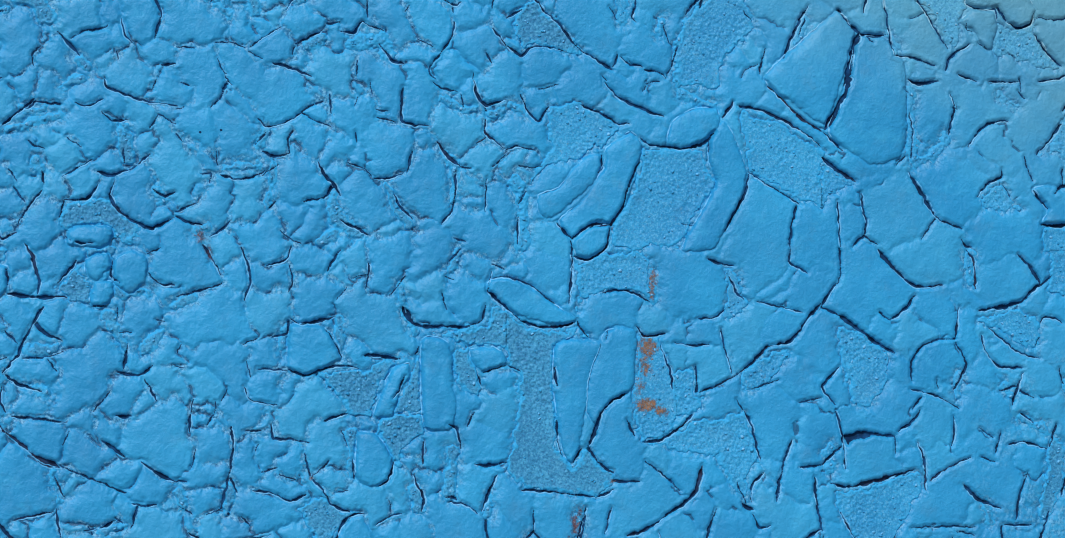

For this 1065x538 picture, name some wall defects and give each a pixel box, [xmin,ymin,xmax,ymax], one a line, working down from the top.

crack [2,0,404,141]
crack [200,94,332,183]
crack [241,201,301,301]
crack [303,162,341,202]
crack [341,221,370,236]
peeling [277,0,760,503]
crack [348,0,1065,538]
peeling [739,110,852,209]
crack [101,263,419,538]
rust [635,338,666,415]
peeling [837,326,890,408]
peeling [835,471,922,538]